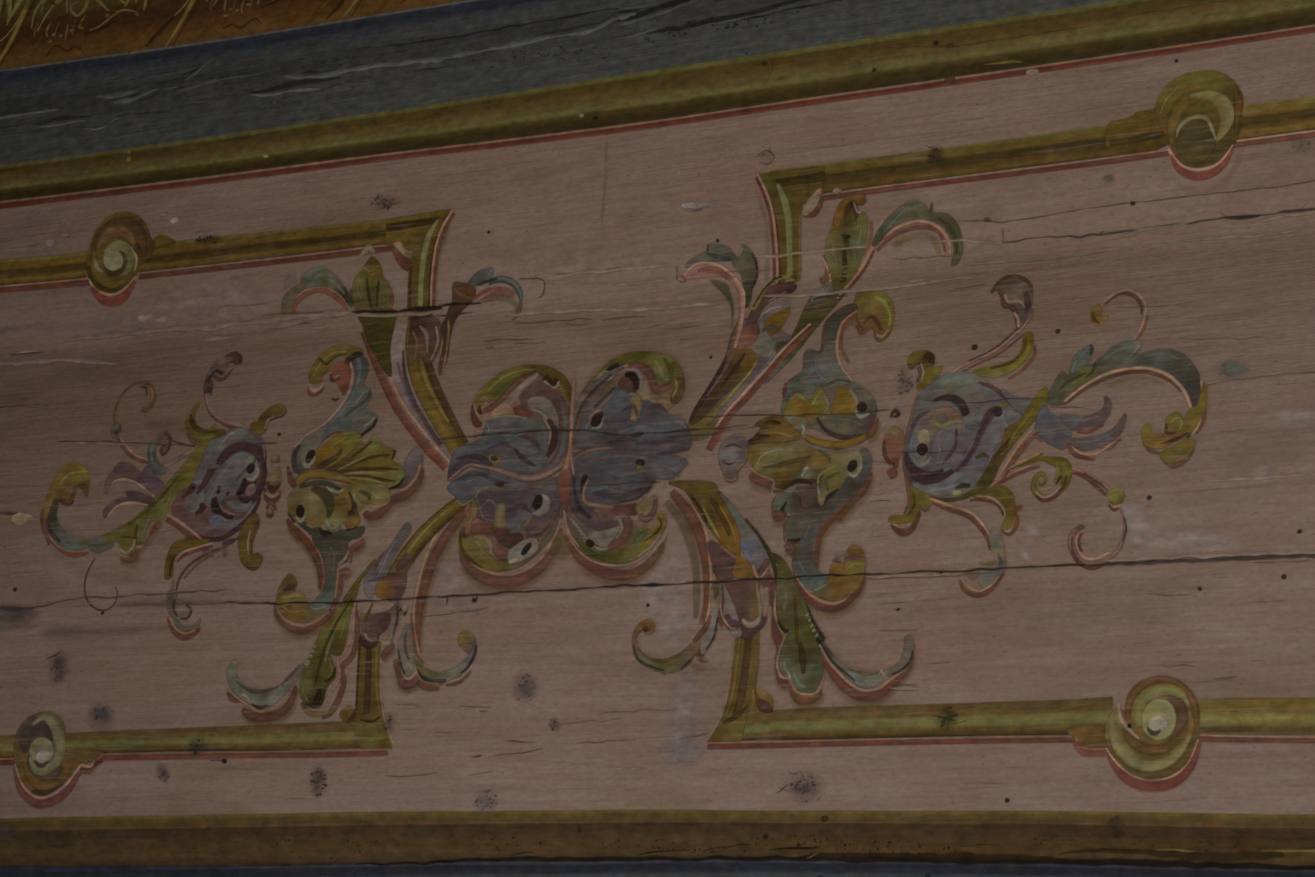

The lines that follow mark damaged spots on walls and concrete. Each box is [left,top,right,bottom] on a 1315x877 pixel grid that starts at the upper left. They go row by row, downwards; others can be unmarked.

crack [924,180,1315,285]
crack [351,303,481,319]
crack [429,409,890,441]
crack [0,551,1315,631]